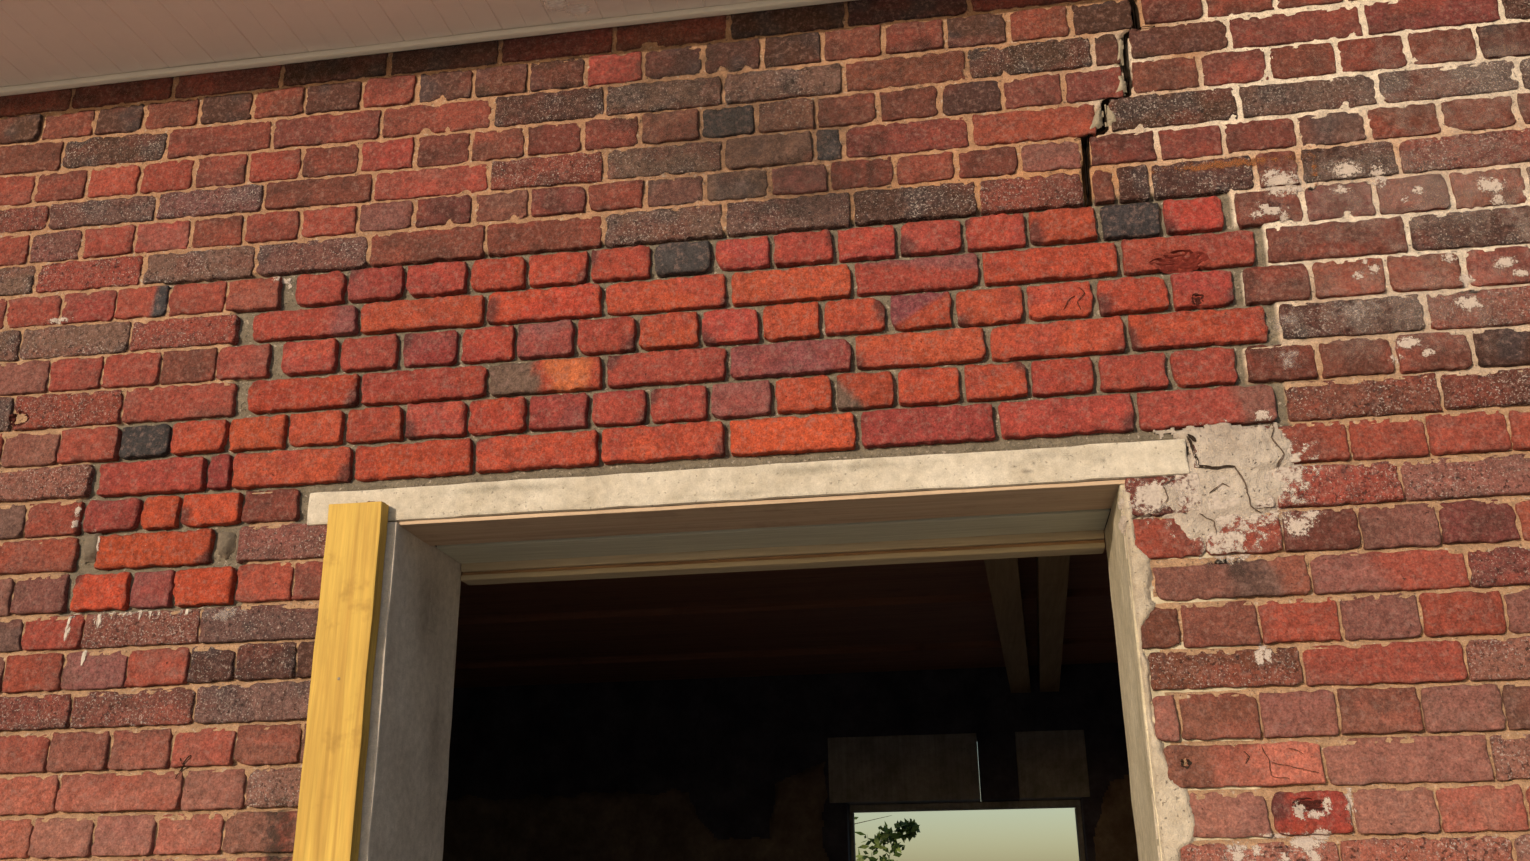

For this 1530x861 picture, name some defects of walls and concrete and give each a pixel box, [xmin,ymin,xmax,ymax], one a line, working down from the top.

crack [1074,0,1155,207]
damp [1251,168,1304,223]
damp [1330,159,1388,195]
damp [1475,177,1506,206]
damp [1352,258,1380,279]
damp [1441,252,1483,312]
damp [1495,256,1530,276]
damp [1390,336,1435,364]
spalling [1118,422,1294,551]
spalling [1292,798,1325,811]